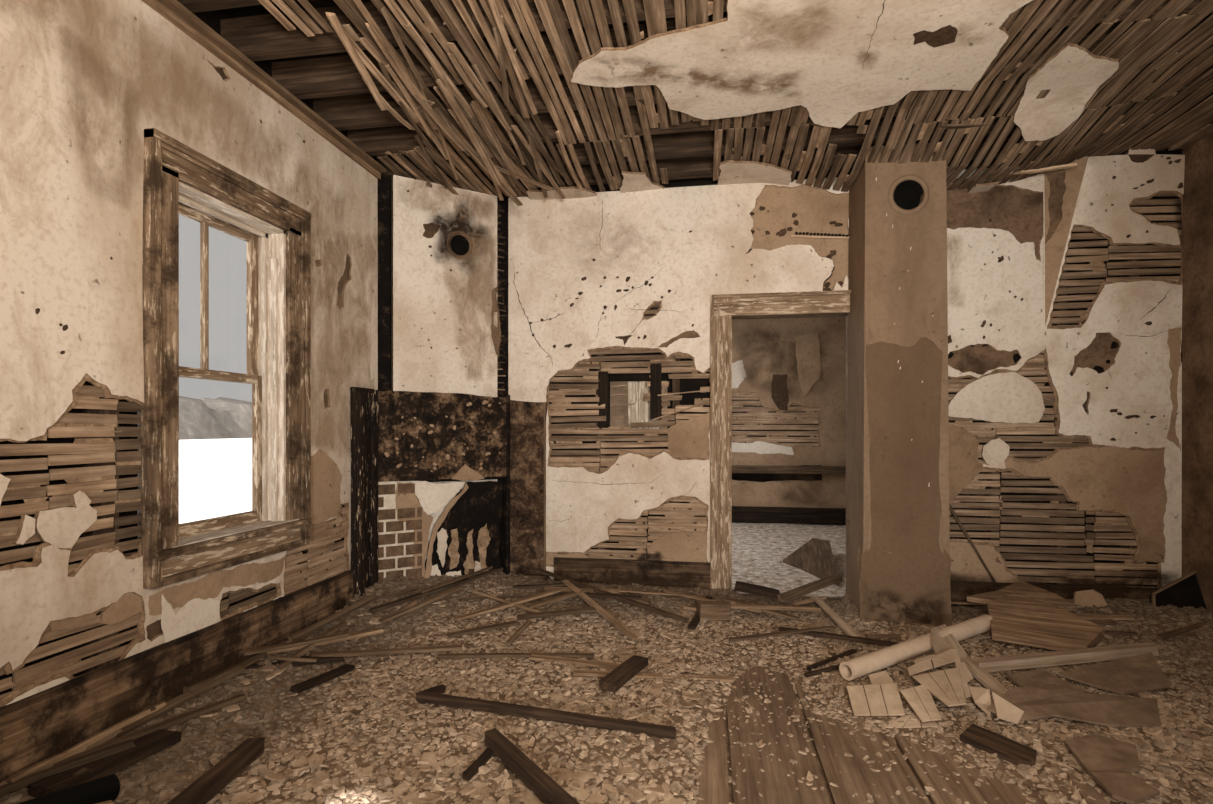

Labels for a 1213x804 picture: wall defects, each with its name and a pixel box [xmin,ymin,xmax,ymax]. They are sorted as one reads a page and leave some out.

flaking render [1126,149,1181,165]
crack [514,273,564,365]
flaking render [600,276,654,314]
crack [598,277,678,332]
flaking render [946,172,1184,329]
flaking render [546,290,710,474]
flaking render [732,332,821,455]
flaking render [0,374,143,577]
flaking render [0,449,350,707]
flaking render [546,495,709,567]
flaking render [858,320,1182,626]